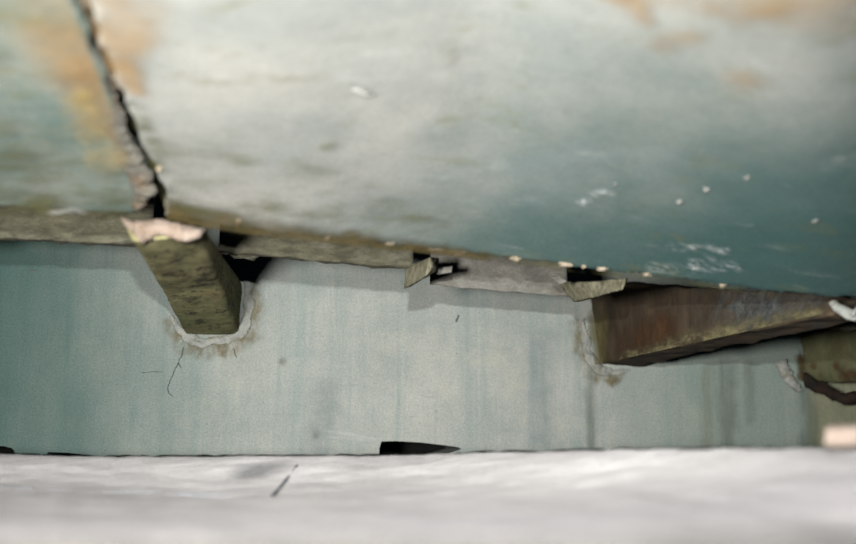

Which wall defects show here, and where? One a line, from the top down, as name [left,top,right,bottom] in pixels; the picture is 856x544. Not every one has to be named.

spalling [557,262,611,272]
crack [141,347,184,397]